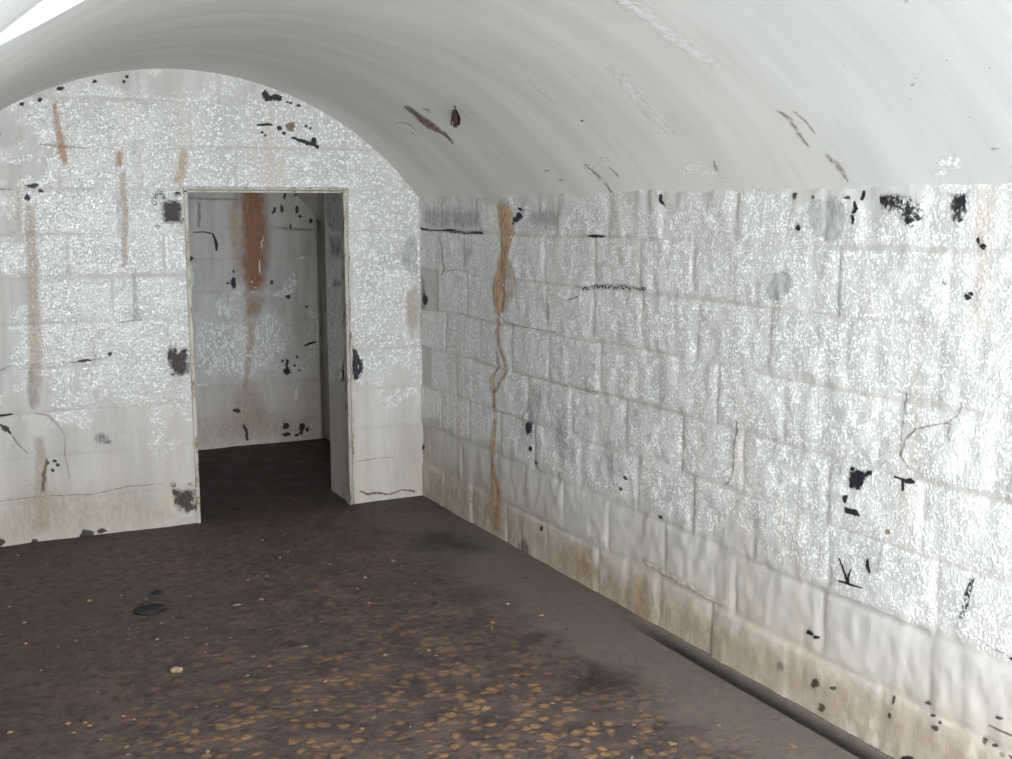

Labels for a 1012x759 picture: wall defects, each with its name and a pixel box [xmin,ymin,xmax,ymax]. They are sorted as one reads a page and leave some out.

rust [54,104,85,161]
rust [405,106,453,144]
peeling [153,191,184,228]
peeling [795,191,866,240]
peeling [879,194,922,227]
rust [243,193,267,290]
rust [490,206,514,408]
peeling [167,347,189,376]
peeling [170,483,196,514]
peeling [842,466,873,517]